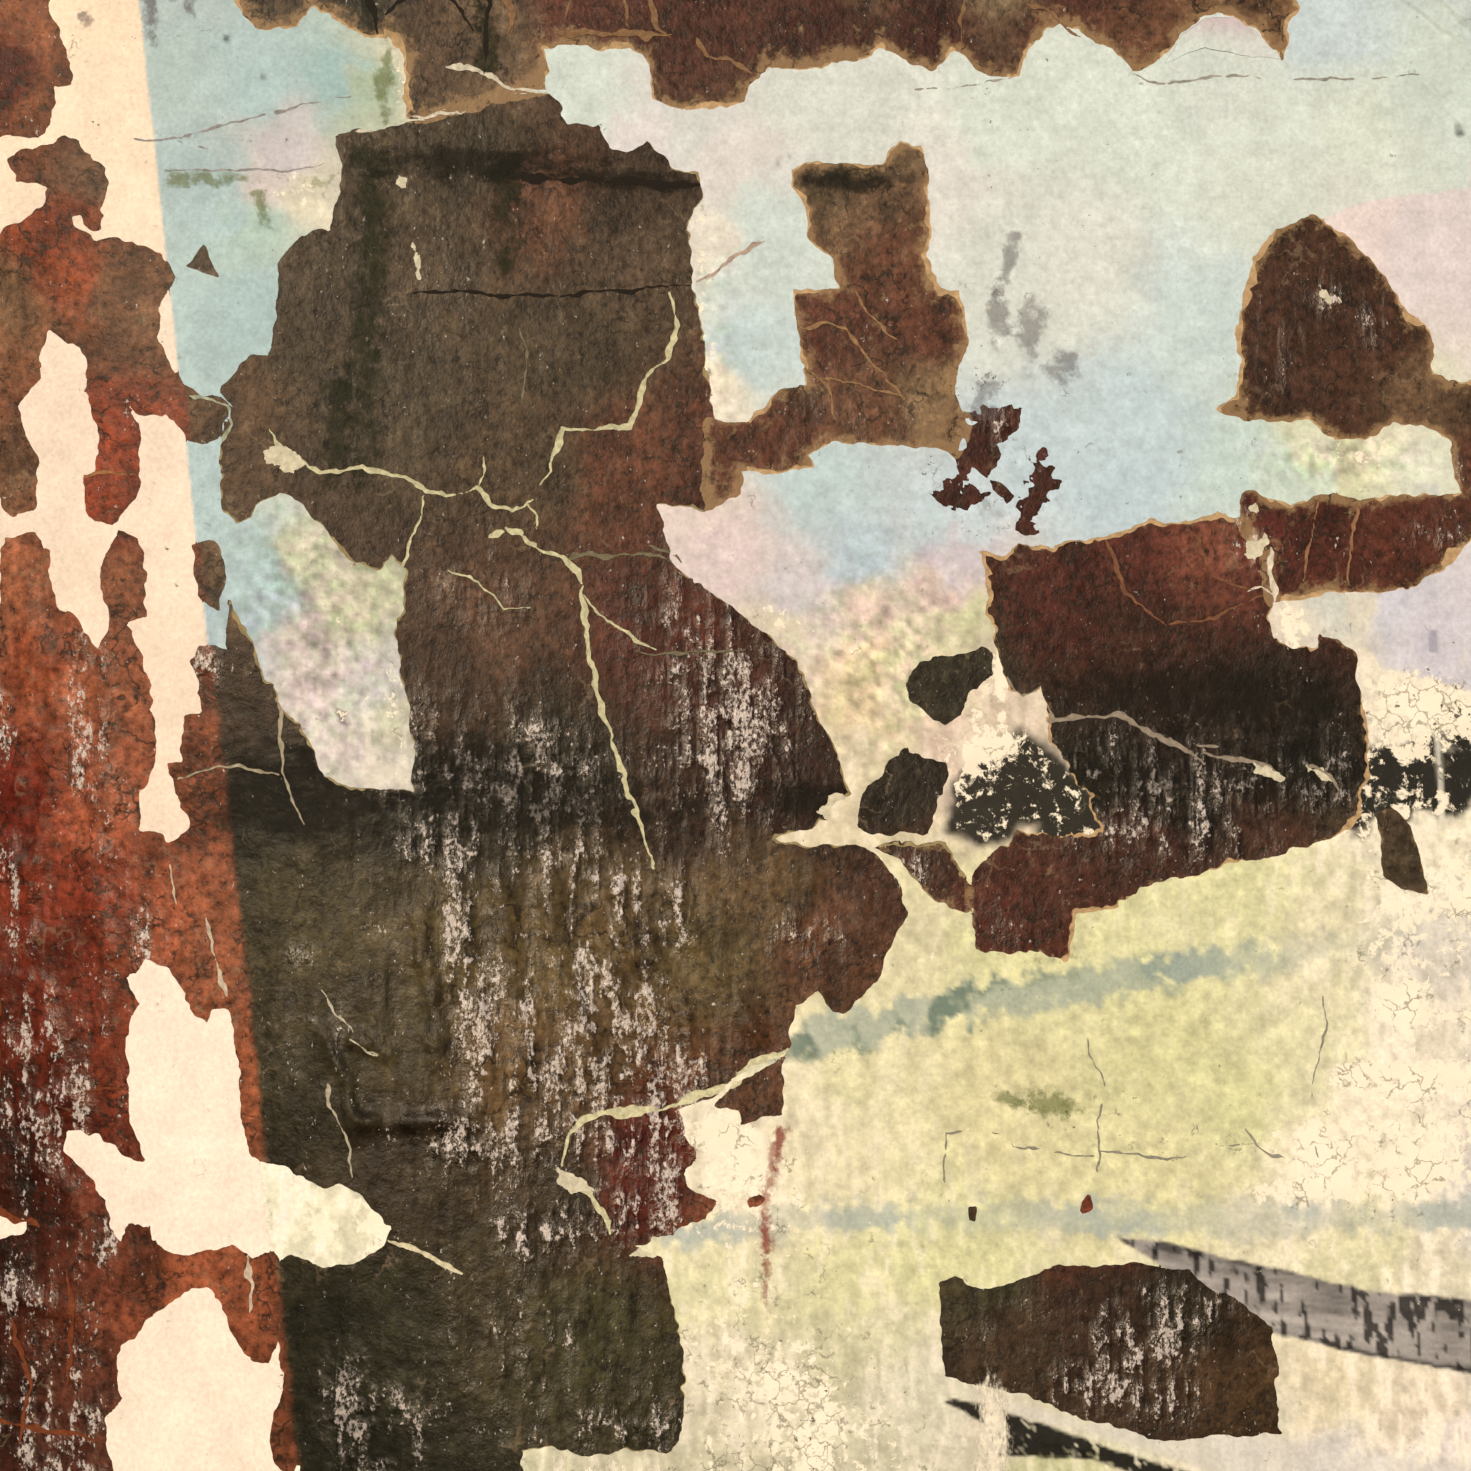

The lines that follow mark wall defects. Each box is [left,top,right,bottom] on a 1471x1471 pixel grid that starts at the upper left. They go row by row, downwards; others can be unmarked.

peeling [0,0,73,138]
peeling [234,0,1300,119]
crack [508,172,700,191]
crack [189,395,233,444]
crack [269,241,765,870]
peeling [878,214,1471,962]
crack [177,703,305,825]
peeling [0,94,1022,1471]
peeling [1080,1195,1093,1214]
peeling [939,1262,1282,1441]